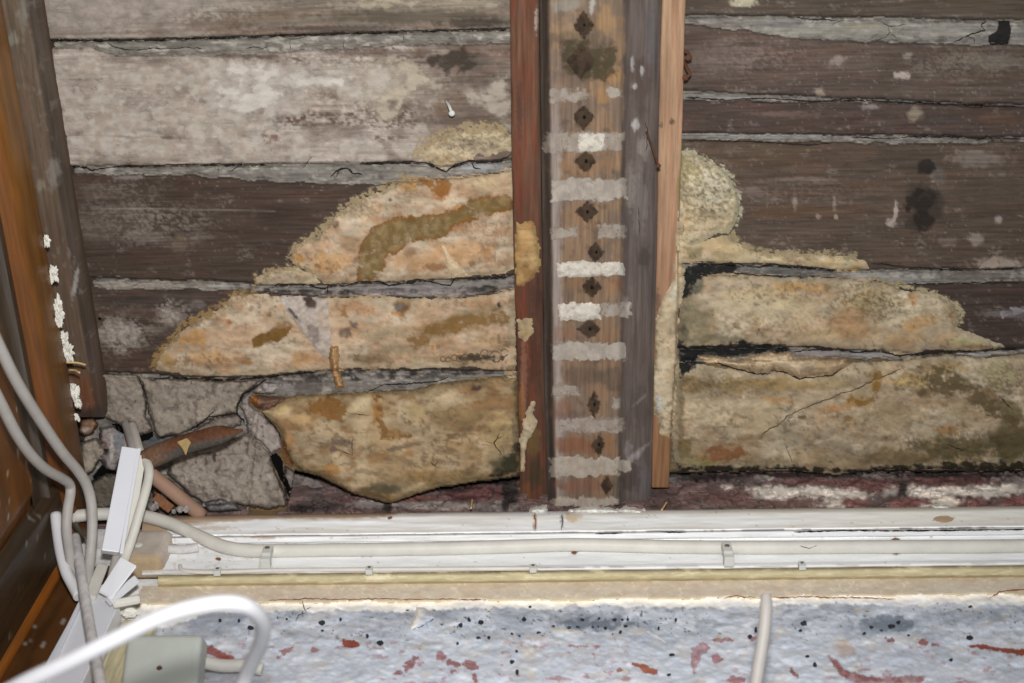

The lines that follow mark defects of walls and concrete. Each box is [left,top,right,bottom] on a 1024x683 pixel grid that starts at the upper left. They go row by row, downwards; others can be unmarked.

crack [955,21,986,43]
leakage [918,159,935,174]
leakage [906,189,936,231]
crack [715,348,1021,461]
peeling [178,438,191,455]